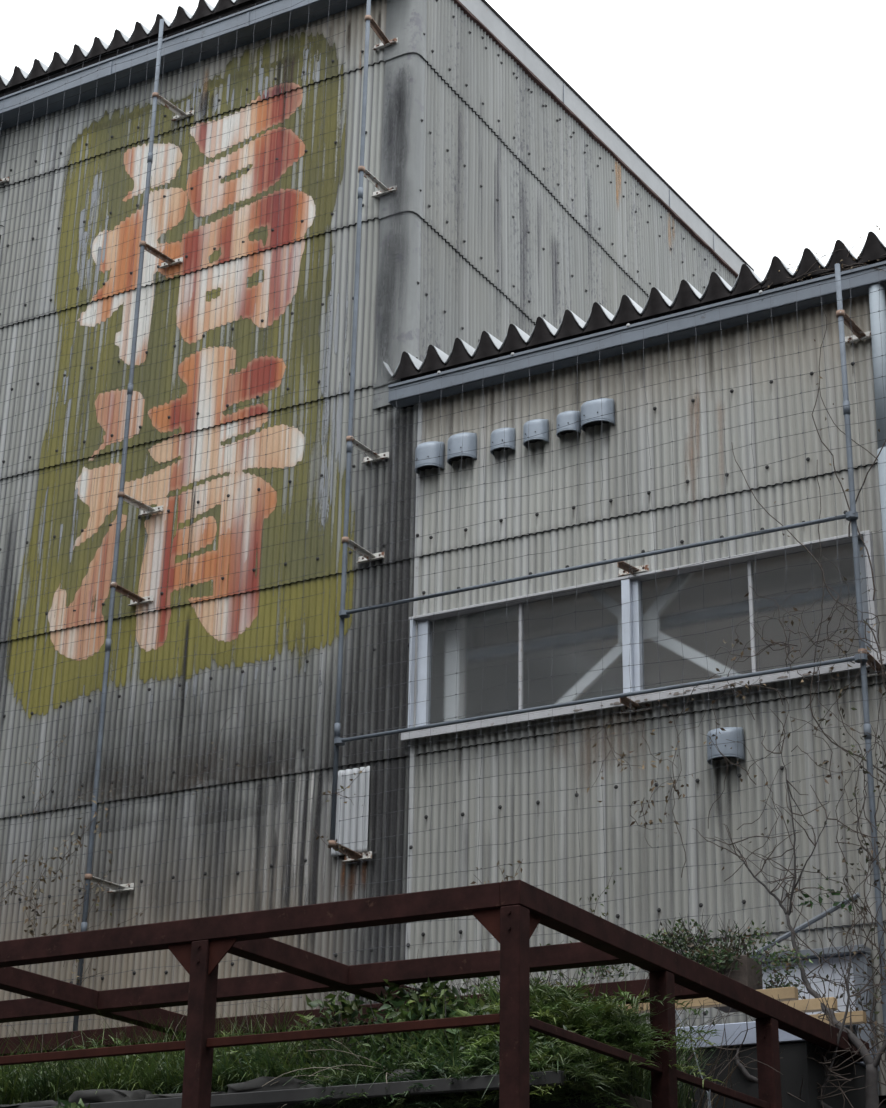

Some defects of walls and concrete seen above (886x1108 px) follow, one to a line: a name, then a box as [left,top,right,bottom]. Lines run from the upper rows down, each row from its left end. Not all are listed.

water stain [240,751,339,909]
water stain [370,416,412,896]